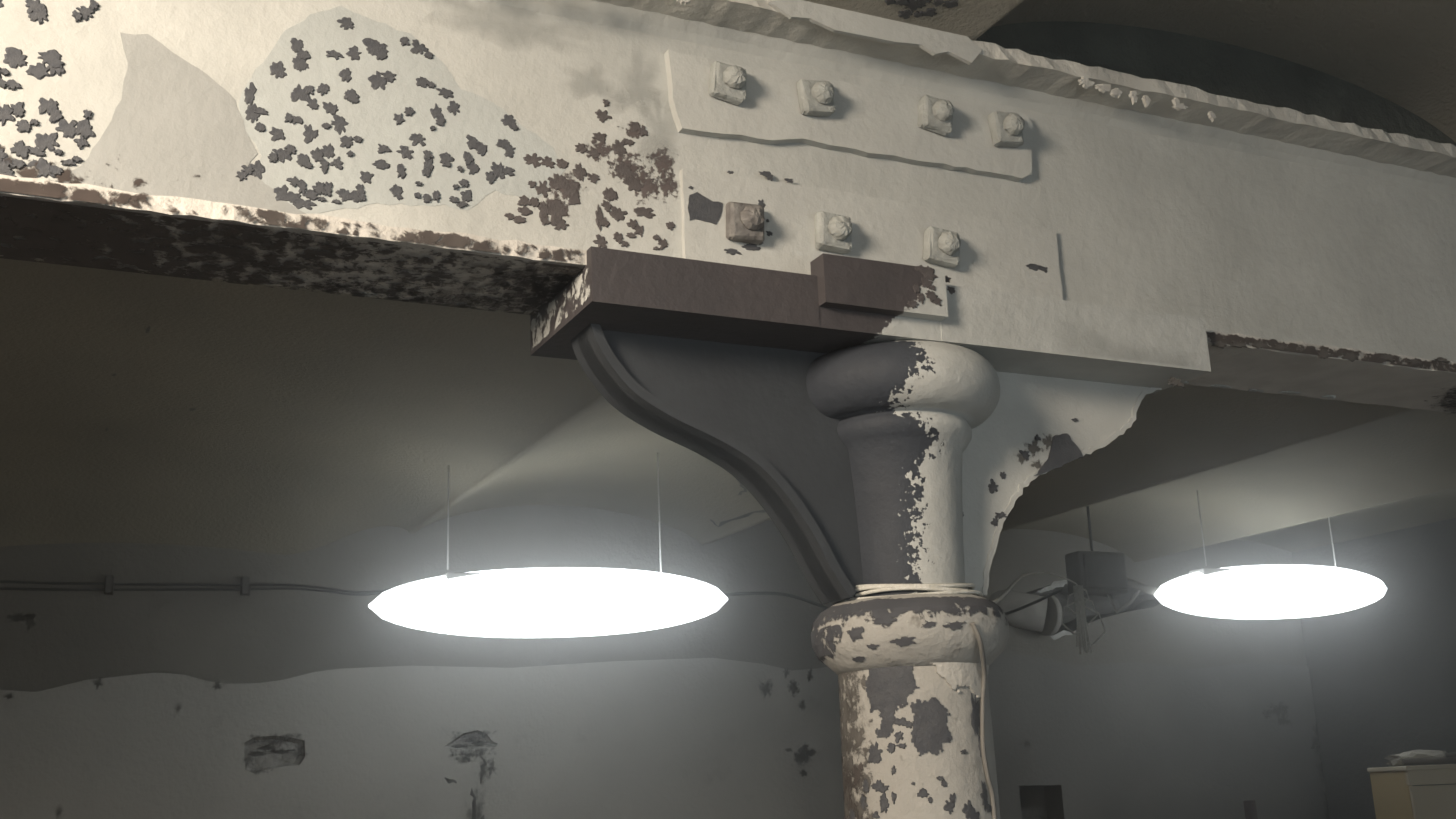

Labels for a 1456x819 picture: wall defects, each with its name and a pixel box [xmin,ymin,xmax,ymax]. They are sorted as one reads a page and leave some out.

peeling [25,0,49,25]
peeling [72,0,99,23]
peeling [885,0,958,19]
peeling [0,6,566,214]
spalling [531,270,590,348]
peeling [1206,332,1456,372]
spalling [1017,418,1083,476]
spalling [988,472,1006,494]
spalling [991,512,1008,526]
peeling [760,596,1007,819]
spalling [244,734,305,774]
spalling [444,730,498,776]